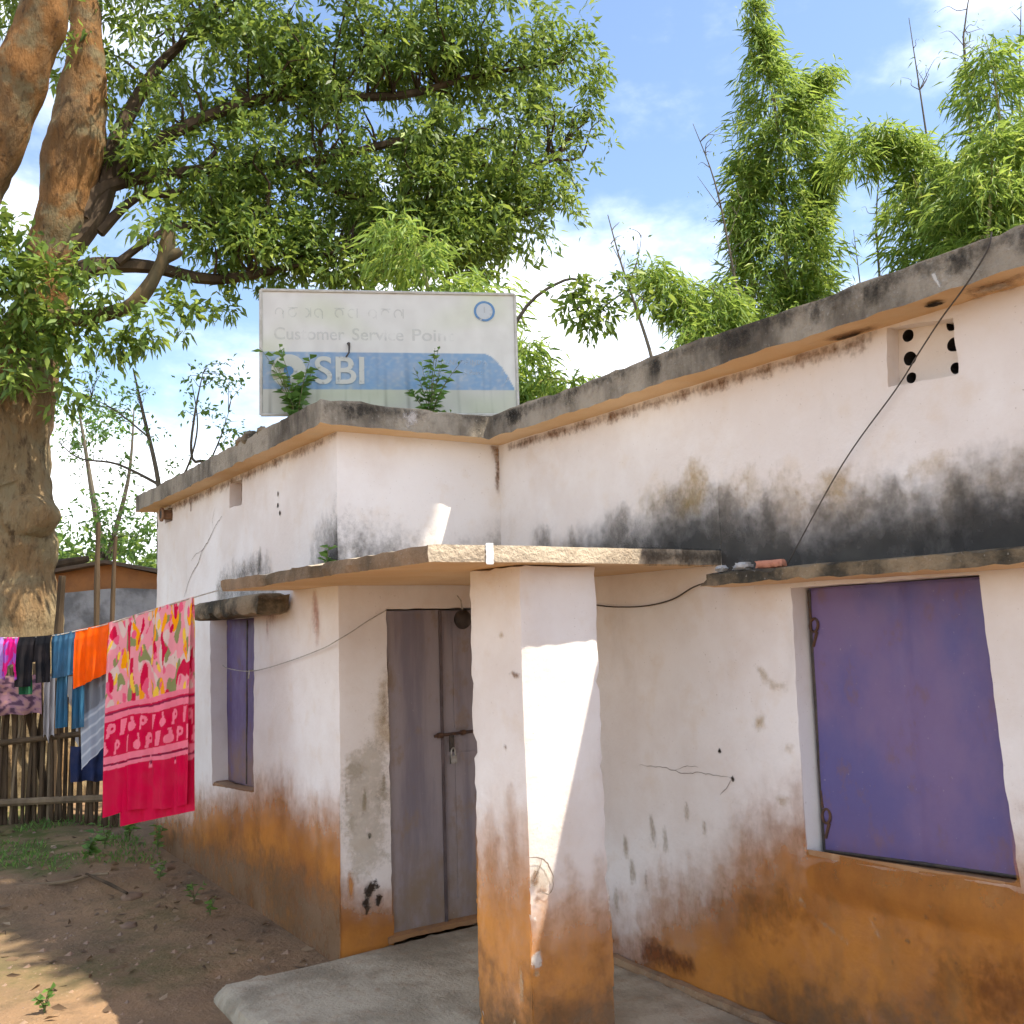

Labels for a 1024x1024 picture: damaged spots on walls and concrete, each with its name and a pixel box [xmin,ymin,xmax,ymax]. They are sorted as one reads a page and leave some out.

leakage [946,248,966,273]
leakage [506,397,555,423]
leakage [492,420,591,489]
leakage [577,480,1024,571]
crack [643,765,730,795]